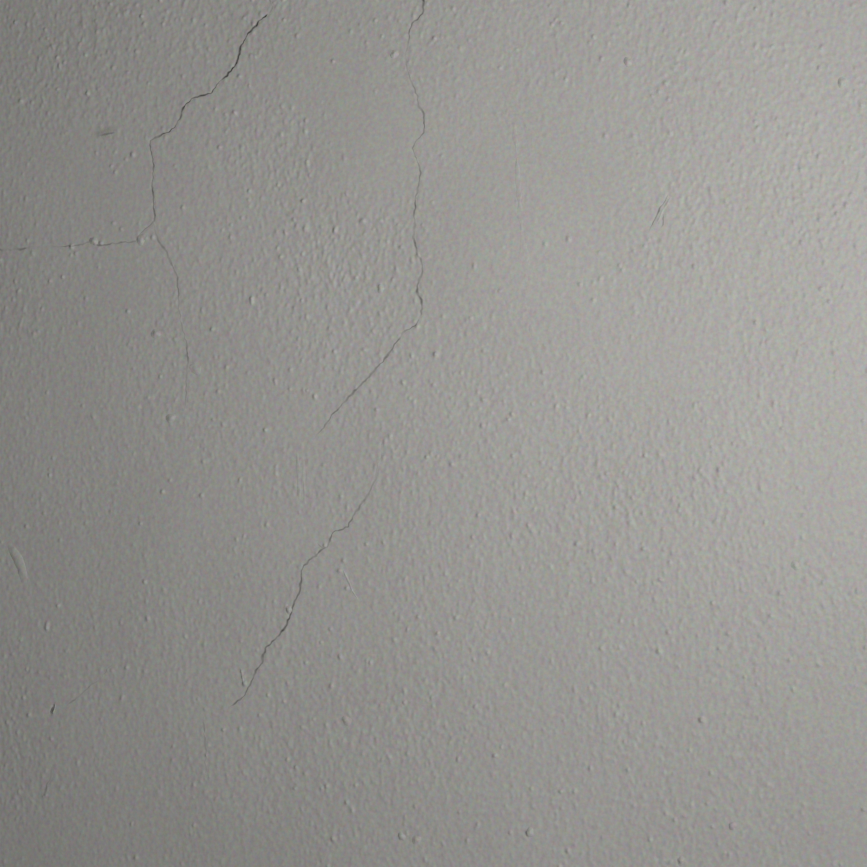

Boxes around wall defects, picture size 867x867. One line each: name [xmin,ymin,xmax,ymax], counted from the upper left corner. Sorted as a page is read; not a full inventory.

crack [0,0,274,411]
crack [314,0,426,440]
crack [228,444,383,709]